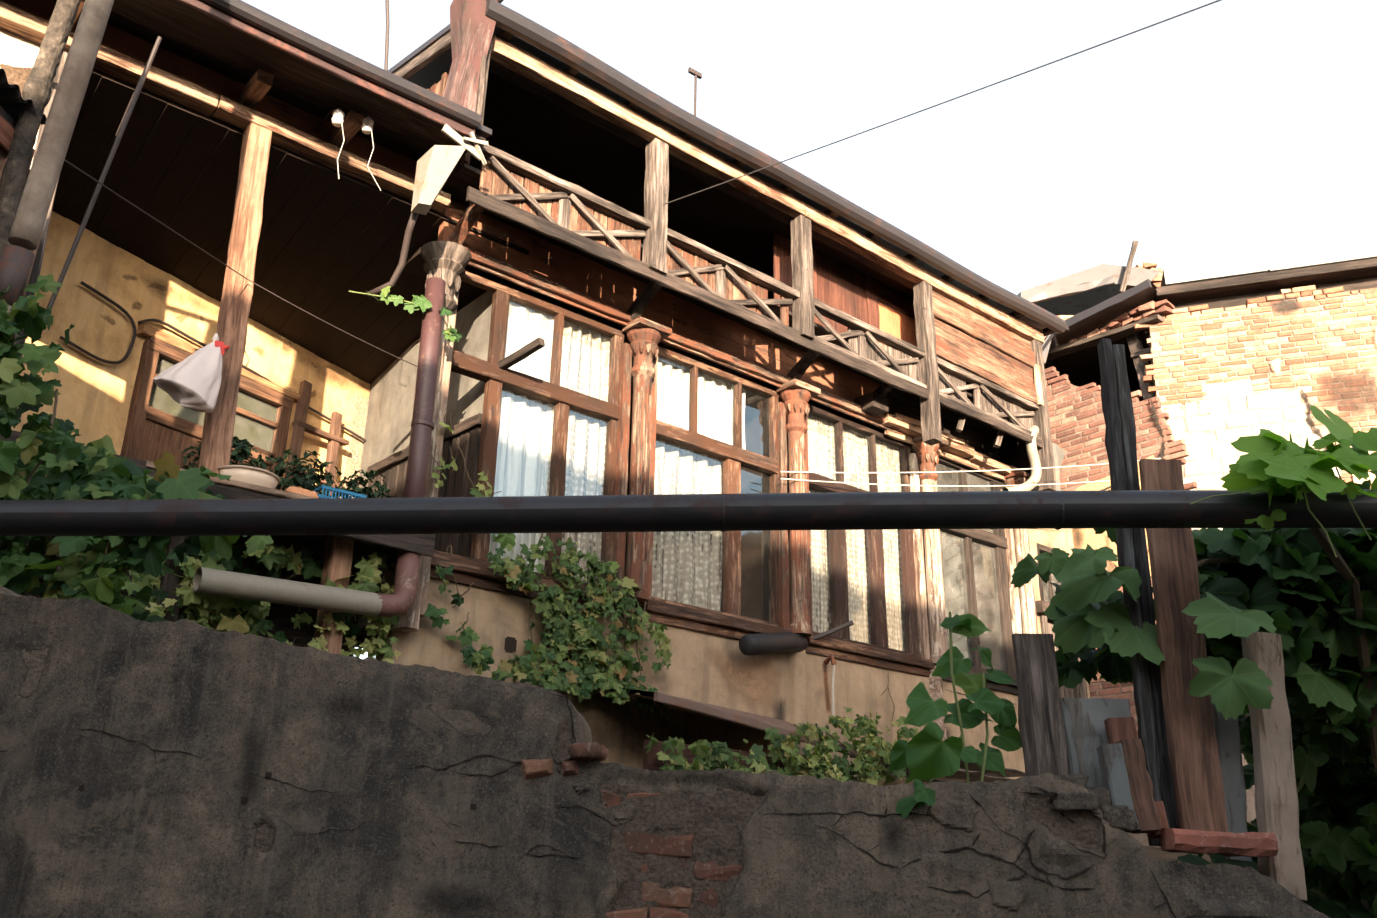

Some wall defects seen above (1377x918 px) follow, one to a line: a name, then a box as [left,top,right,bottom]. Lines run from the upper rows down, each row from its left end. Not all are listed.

crack [76,720,204,761]
crack [406,693,634,826]
spalling [521,709,769,918]
crack [764,786,1107,898]
crack [1151,870,1176,918]